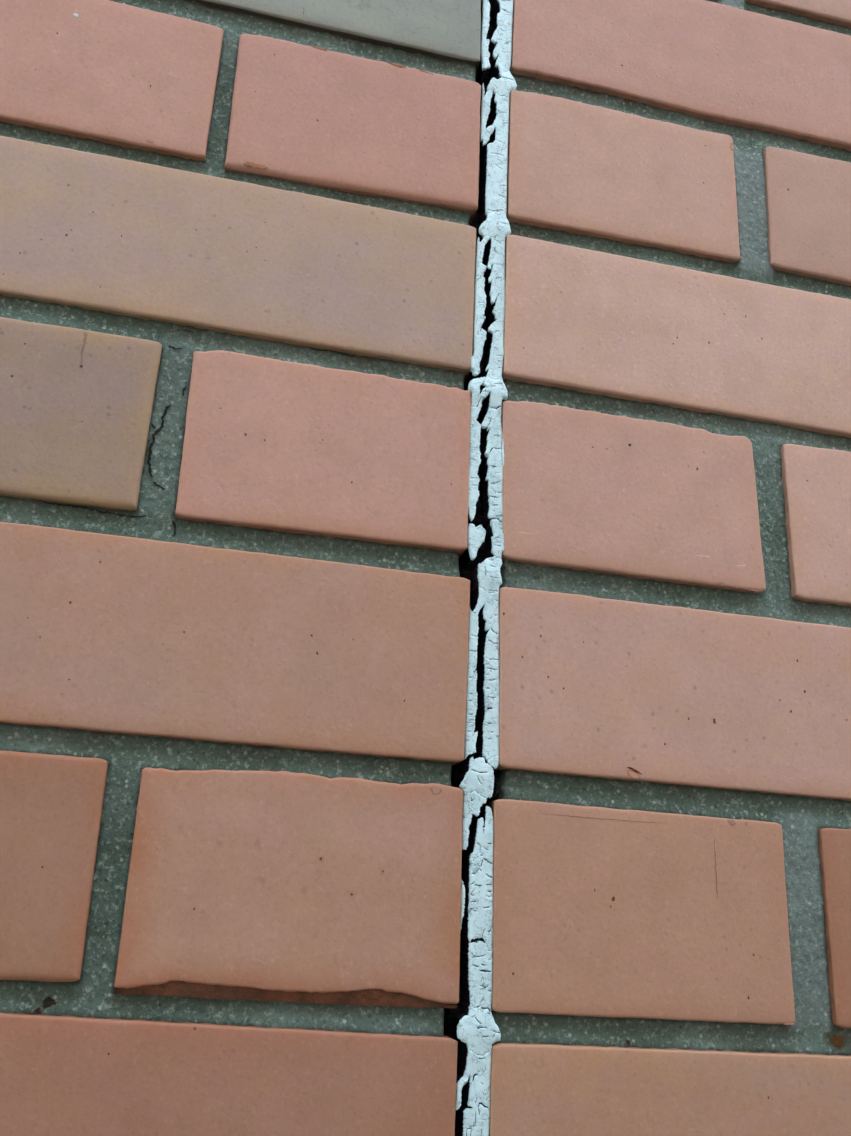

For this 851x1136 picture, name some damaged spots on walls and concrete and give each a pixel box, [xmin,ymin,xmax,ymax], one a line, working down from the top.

crack [147,386,187,490]
crack [44,501,176,537]
crack [448,0,504,1136]